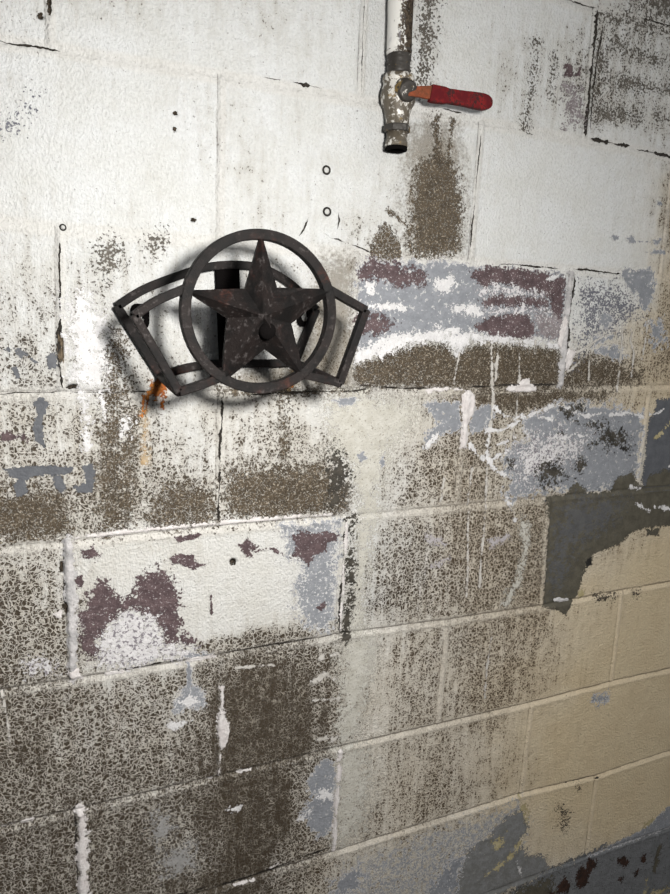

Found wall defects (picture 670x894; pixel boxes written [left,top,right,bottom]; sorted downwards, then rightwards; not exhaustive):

water stain [411,0,448,86]
water stain [588,0,670,134]
water stain [369,110,466,263]
peeling [351,252,669,375]
rust [140,379,168,465]
peeling [65,533,213,731]
peeling [230,514,345,636]
water stain [0,222,651,856]
peeling [420,386,670,616]
peeling [317,793,670,894]
rust [549,856,598,894]
rust [617,854,646,883]